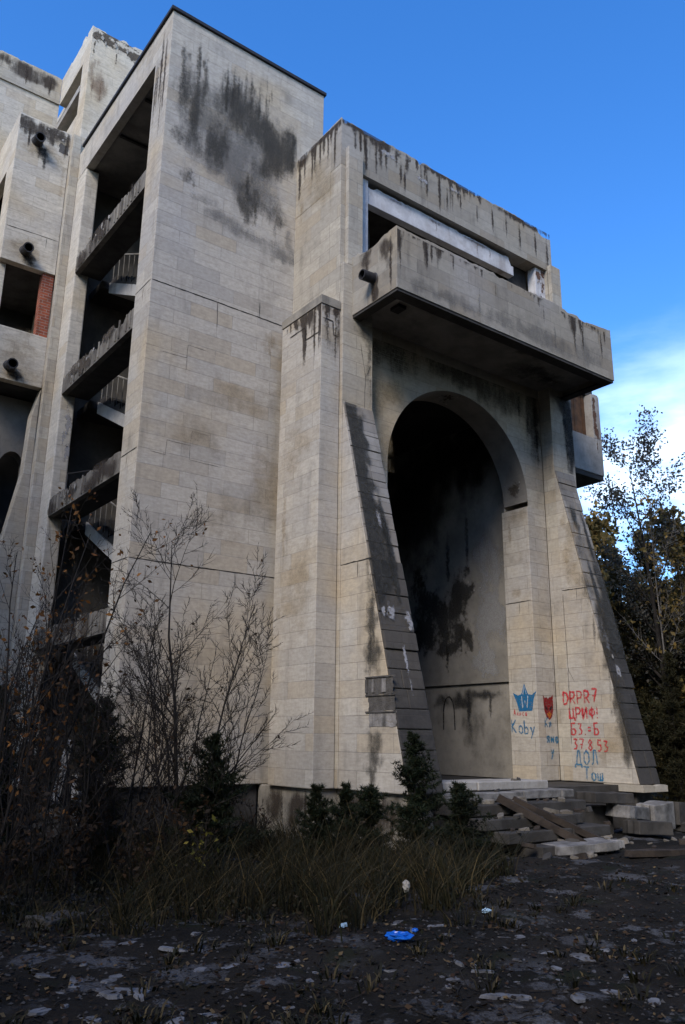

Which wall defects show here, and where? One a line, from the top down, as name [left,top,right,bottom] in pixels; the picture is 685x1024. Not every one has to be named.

water stain [0,54,57,93]
water stain [176,48,481,225]
water stain [491,207,549,264]
water stain [362,228,482,301]
water stain [287,303,340,359]
water stain [528,311,605,359]
water stain [376,499,400,598]
water stain [365,596,380,665]
water stain [437,691,493,731]
water stain [369,736,380,783]